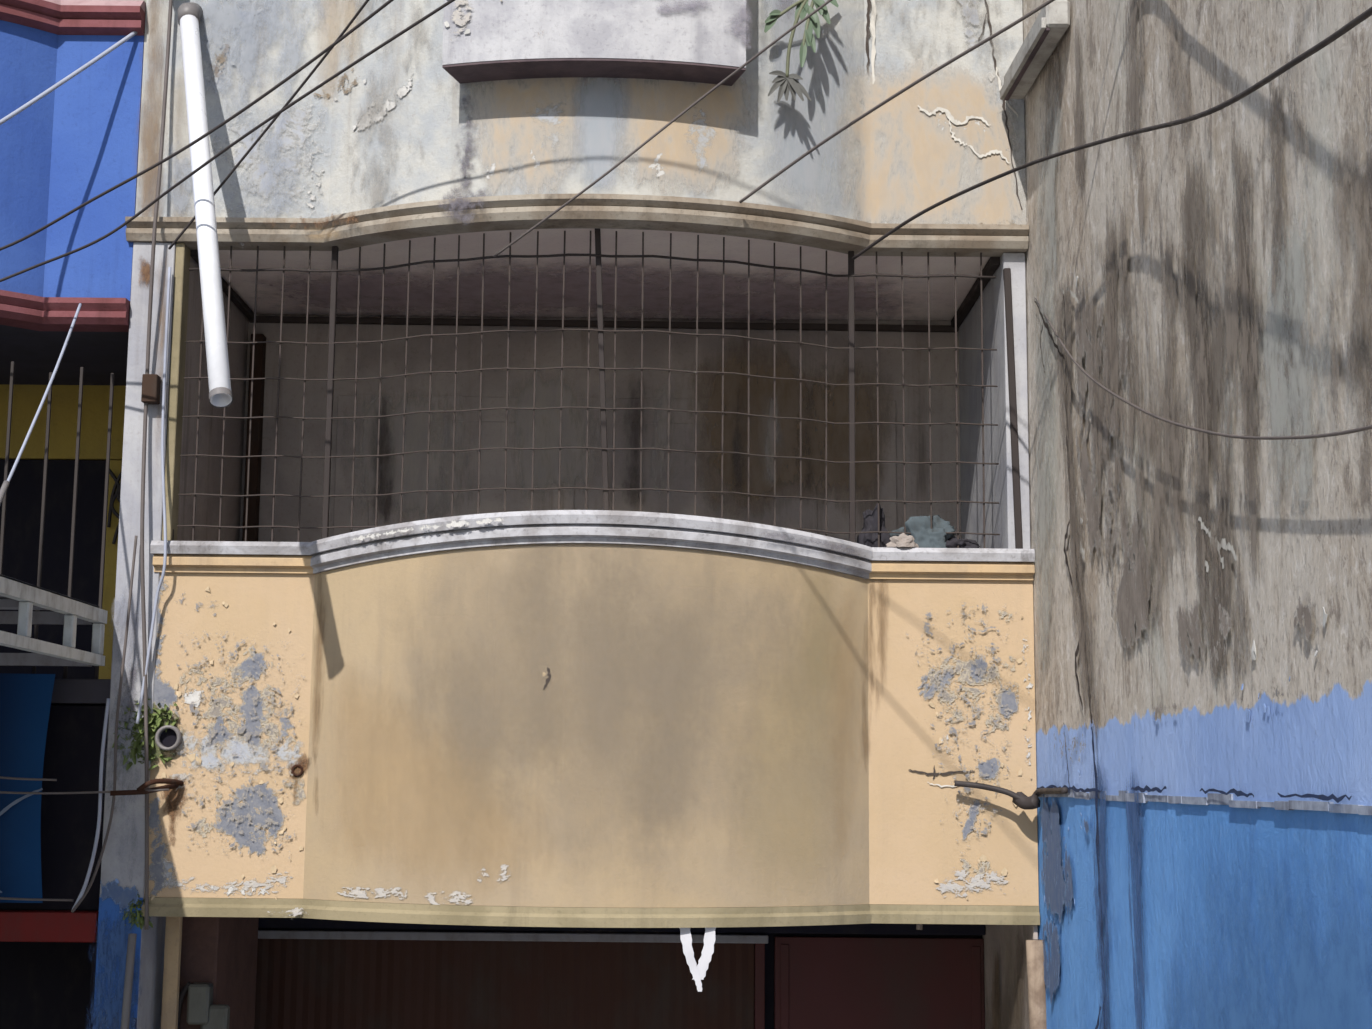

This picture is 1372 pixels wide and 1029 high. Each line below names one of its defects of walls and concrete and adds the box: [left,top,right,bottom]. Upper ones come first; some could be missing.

crack [865,0,877,84]
peeling [839,60,1027,225]
crack [918,0,1023,210]
leakage [354,394,463,518]
leakage [697,349,883,512]
leakage [1034,0,1372,730]
corrosion [162,778,185,843]
peeling [100,577,307,917]
corrosion [289,756,309,798]
peeling [906,602,1033,900]
flaking render [1040,794,1089,1005]
leakage [1126,775,1144,1029]